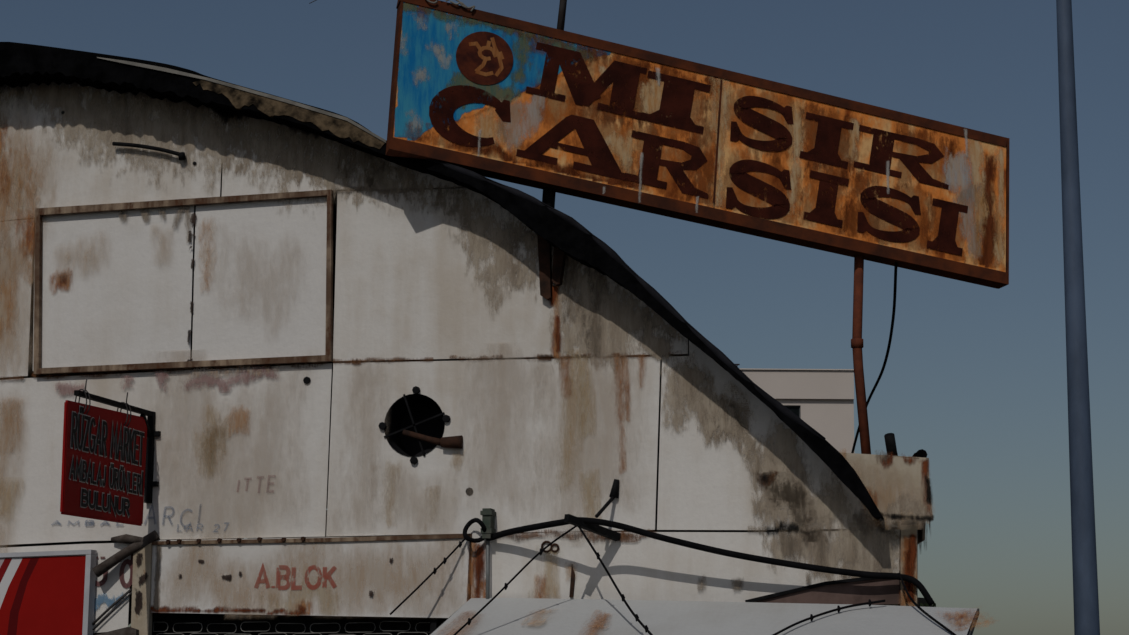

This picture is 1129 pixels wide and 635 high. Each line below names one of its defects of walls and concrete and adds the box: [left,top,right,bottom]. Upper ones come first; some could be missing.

leakage [0,82,539,310]
rust [51,270,71,290]
rust [1,371,121,380]
leakage [551,255,933,579]
rust [863,454,934,528]
rust [901,534,927,606]